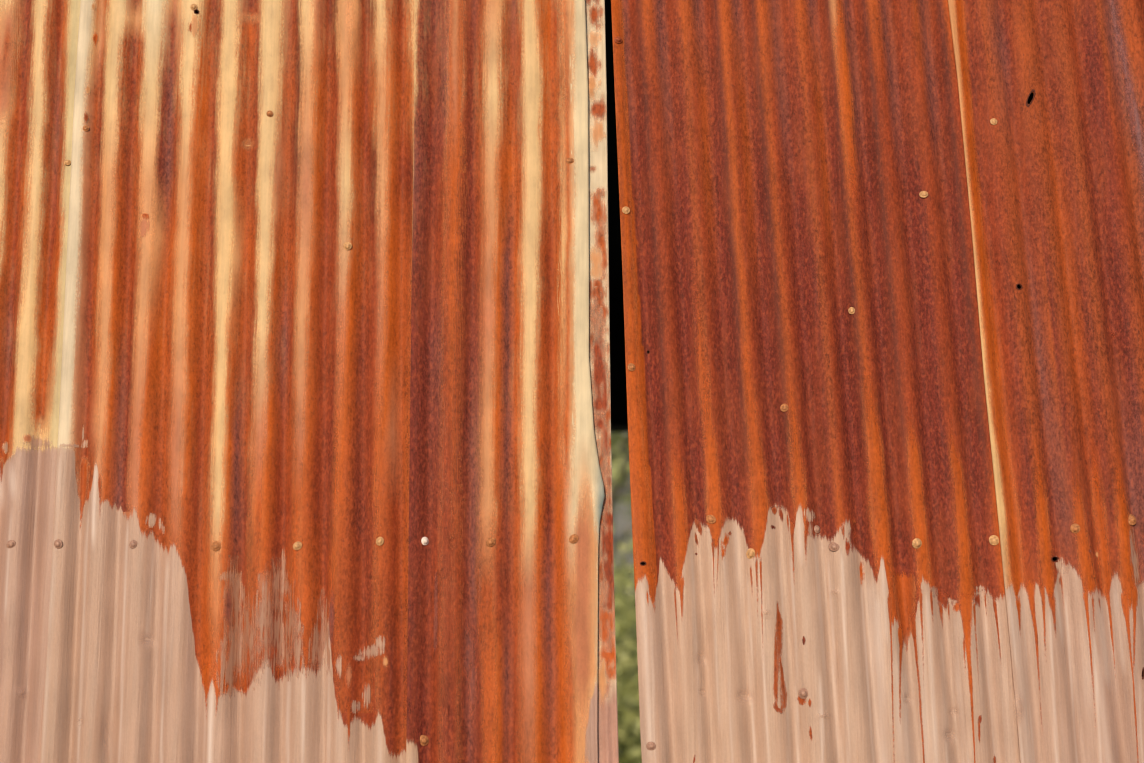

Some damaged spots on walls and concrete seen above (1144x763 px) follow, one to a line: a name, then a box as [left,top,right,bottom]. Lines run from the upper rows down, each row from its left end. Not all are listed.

corrosion [0,0,68,480]
peeling [23,427,88,450]
peeling [146,513,165,536]
peeling [216,549,388,698]
peeling [352,685,370,714]
corrosion [73,0,656,763]
corrosion [744,372,811,713]
peeling [841,520,856,555]
corrosion [864,388,1001,763]
peeling [973,585,989,607]
corrosion [956,0,1063,690]
corrosion [1073,468,1139,763]